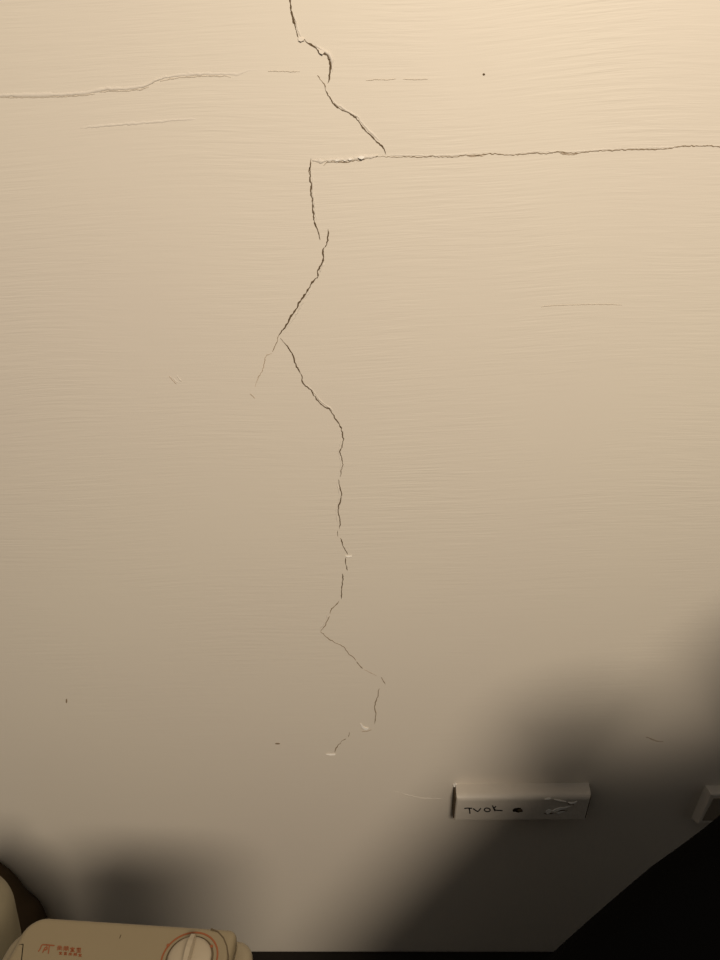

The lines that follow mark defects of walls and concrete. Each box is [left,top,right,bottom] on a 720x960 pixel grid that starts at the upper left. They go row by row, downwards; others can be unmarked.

crack [289,0,720,158]
crack [250,160,385,721]